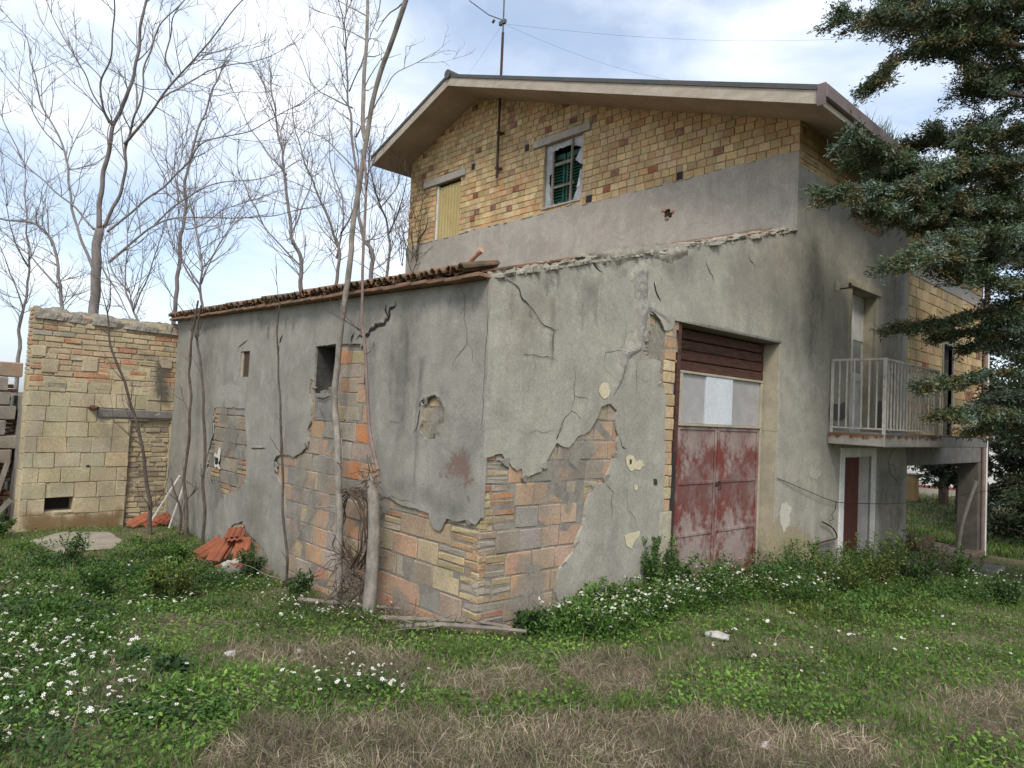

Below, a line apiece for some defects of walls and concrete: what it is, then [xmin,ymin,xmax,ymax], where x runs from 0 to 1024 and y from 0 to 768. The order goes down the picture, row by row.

water stain [156,360,170,402]
crack [350,300,396,385]
crack [507,279,554,359]
crack [533,385,588,440]
flaking render [207,406,252,508]
spalling [273,343,644,635]